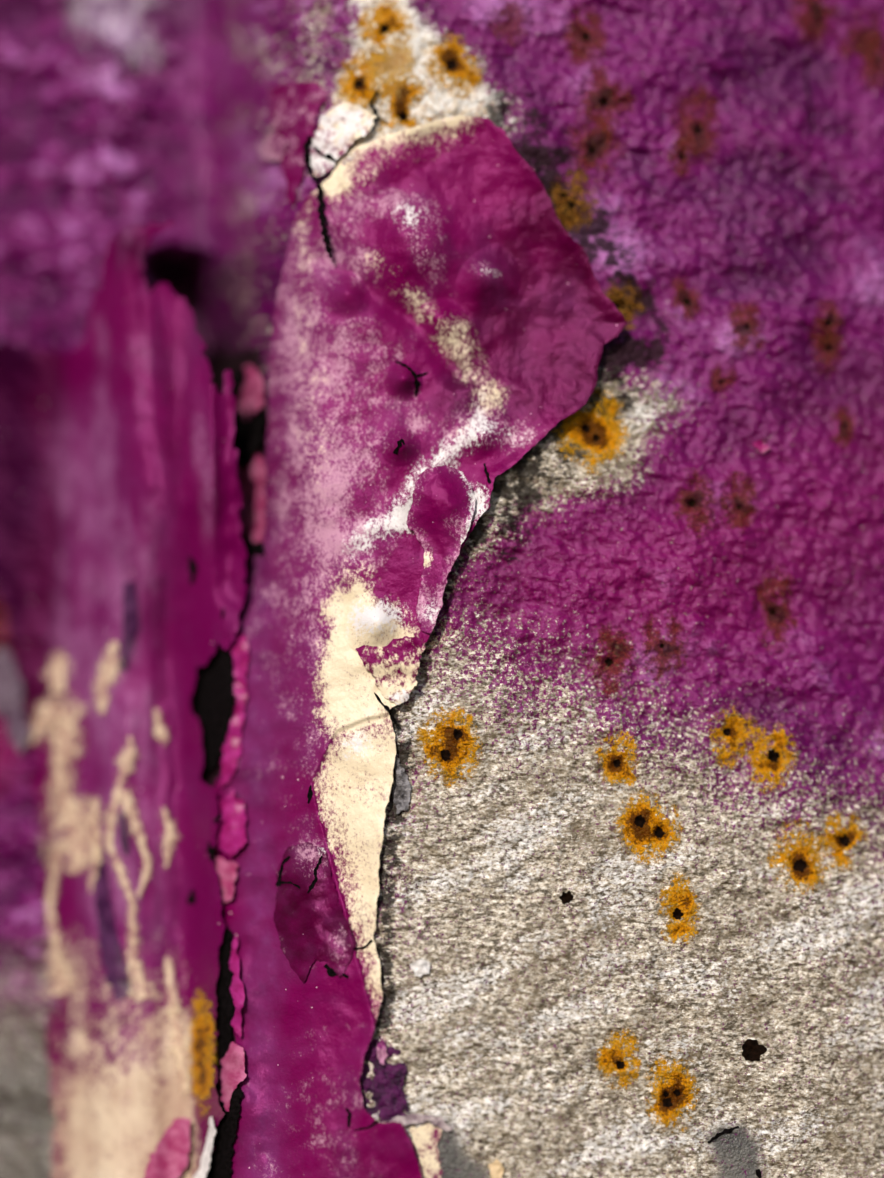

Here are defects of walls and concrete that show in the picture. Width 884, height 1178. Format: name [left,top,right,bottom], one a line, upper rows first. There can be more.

corrosion [335,0,482,133]
crack [303,135,337,258]
peeling [0,81,627,1178]
corrosion [416,706,483,788]
corrosion [596,731,683,865]
crack [275,856,323,893]
crack [323,939,373,978]
corrosion [657,872,702,946]
corrosion [767,811,868,895]
corrosion [188,989,217,1116]
corrosion [596,1029,700,1132]
corrosion [742,1039,767,1062]